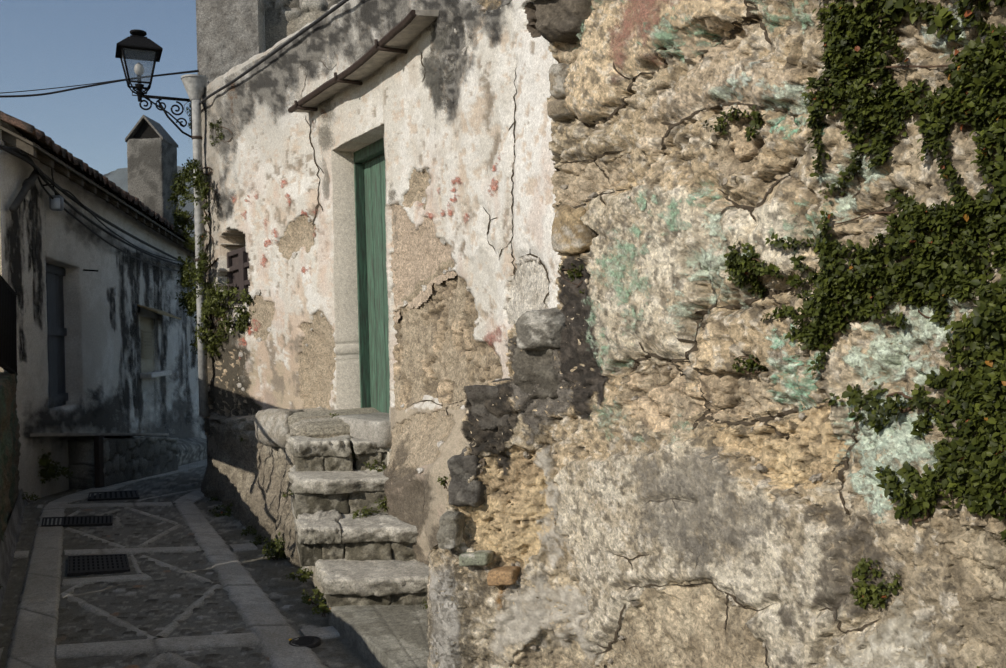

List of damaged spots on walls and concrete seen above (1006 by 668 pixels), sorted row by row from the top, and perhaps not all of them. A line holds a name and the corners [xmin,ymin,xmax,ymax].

spalling [260,209,316,267]
spalling [298,310,336,410]
crack [298,58,338,240]
damp [204,0,511,219]
spalling [386,168,503,480]
crack [483,65,550,302]
flaking render [506,255,550,325]
crack [595,538,774,655]